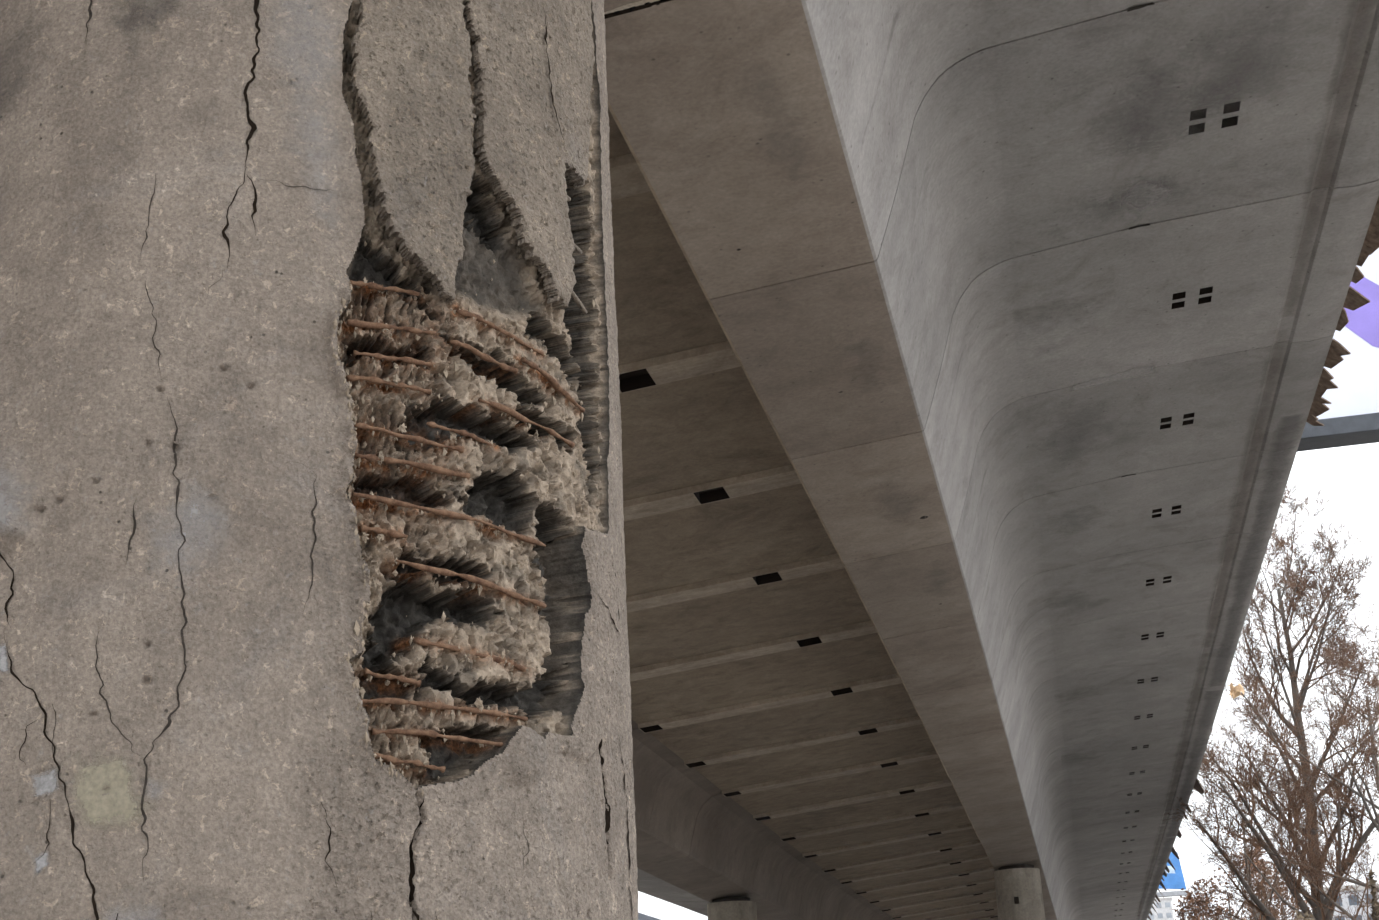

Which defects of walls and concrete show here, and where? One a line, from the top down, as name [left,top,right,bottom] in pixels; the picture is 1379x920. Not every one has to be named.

crack [202,0,334,307]
crack [544,13,569,160]
crack [95,175,188,873]
spalling [332,0,672,797]
crack [0,553,118,920]
crack [408,799,437,920]
crack [598,691,633,920]